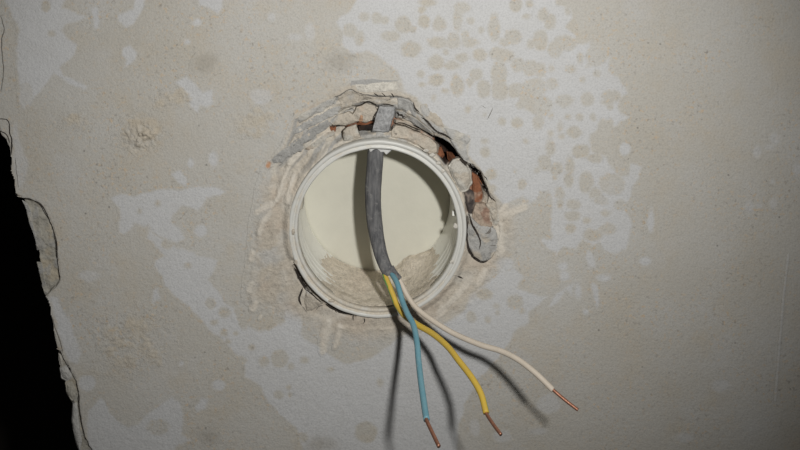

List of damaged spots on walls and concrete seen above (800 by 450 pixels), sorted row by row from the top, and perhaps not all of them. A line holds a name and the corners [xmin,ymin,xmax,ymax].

flaking render [18,196,61,299]
flaking render [240,81,524,348]
flaking render [57,348,93,450]